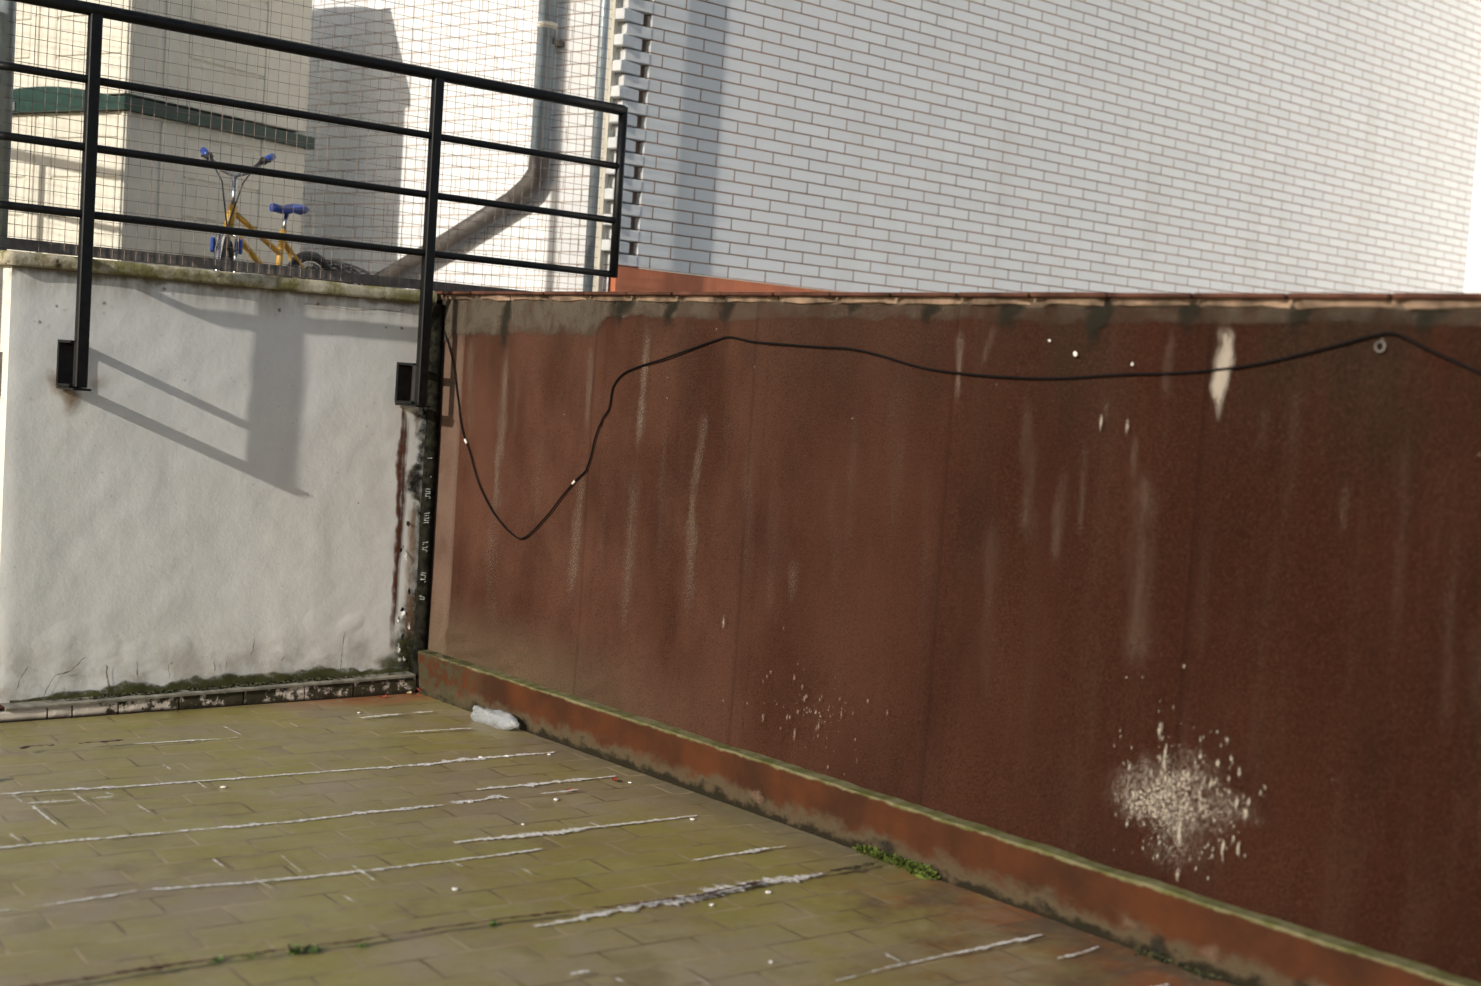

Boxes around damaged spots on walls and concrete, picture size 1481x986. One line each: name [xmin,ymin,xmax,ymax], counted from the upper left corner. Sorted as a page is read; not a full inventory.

leakage [1212,335,1232,403]
rust [390,409,420,644]